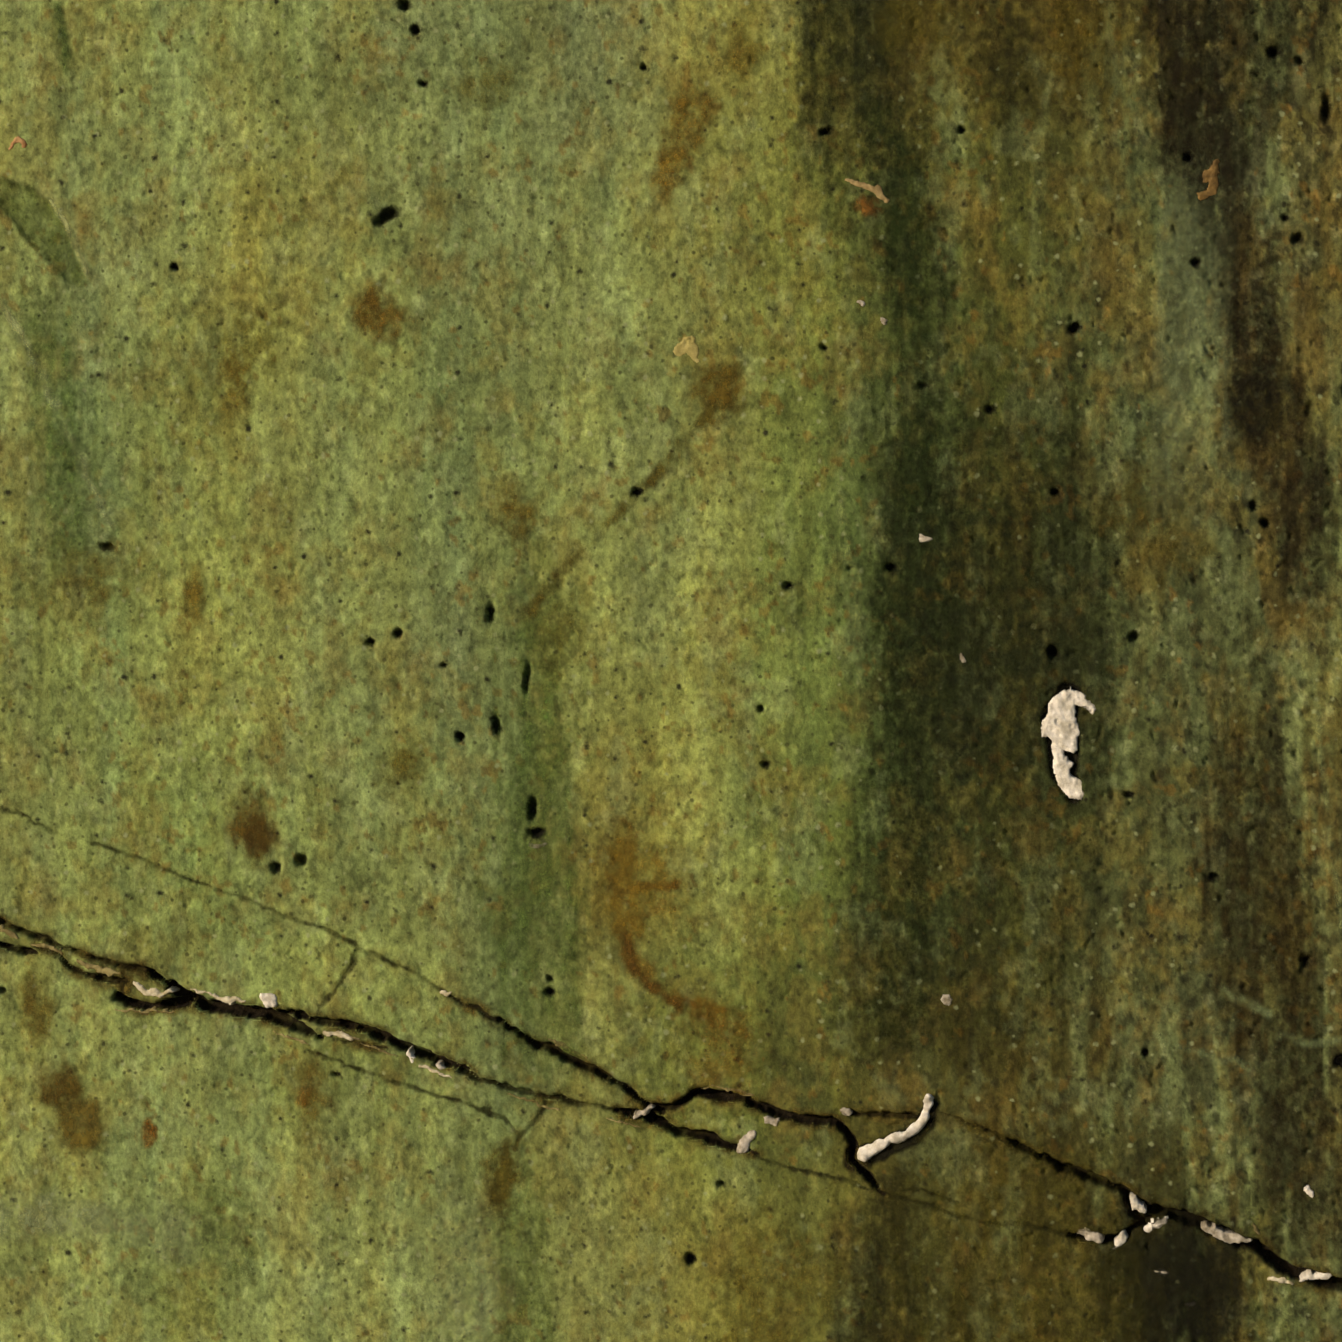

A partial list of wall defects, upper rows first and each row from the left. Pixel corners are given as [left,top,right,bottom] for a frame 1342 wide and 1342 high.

corrosion [652,94,714,193]
corrosion [353,288,402,337]
leakage [1148,0,1335,594]
leakage [801,0,1113,852]
corrosion [226,798,275,859]
corrosion [606,820,744,1069]
leakage [1203,731,1335,1231]
corrosion [38,1066,100,1149]
crack [0,915,1342,1291]
leakage [833,1141,1051,1342]
leakage [1057,1192,1253,1342]
leakage [1299,1269,1332,1282]